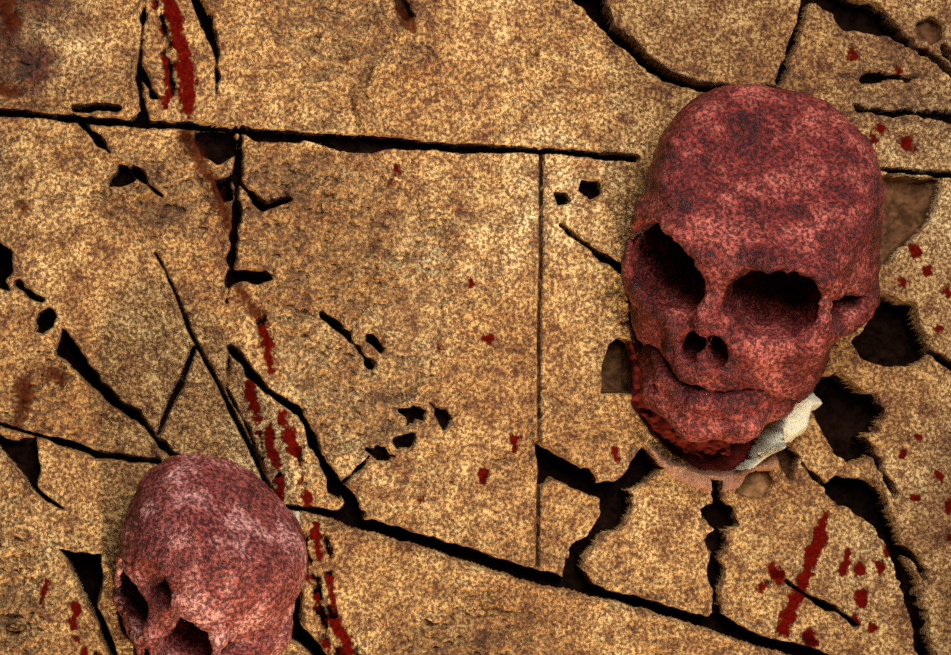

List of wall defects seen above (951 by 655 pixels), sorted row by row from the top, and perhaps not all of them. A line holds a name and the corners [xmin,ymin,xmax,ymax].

crack [191,0,219,89]
crack [572,0,722,92]
crack [775,0,951,84]
crack [0,50,636,289]
crack [881,168,951,178]
crack [0,253,270,505]
crack [927,352,951,371]
crack [227,289,825,655]
crack [809,437,930,655]
crack [785,582,856,626]